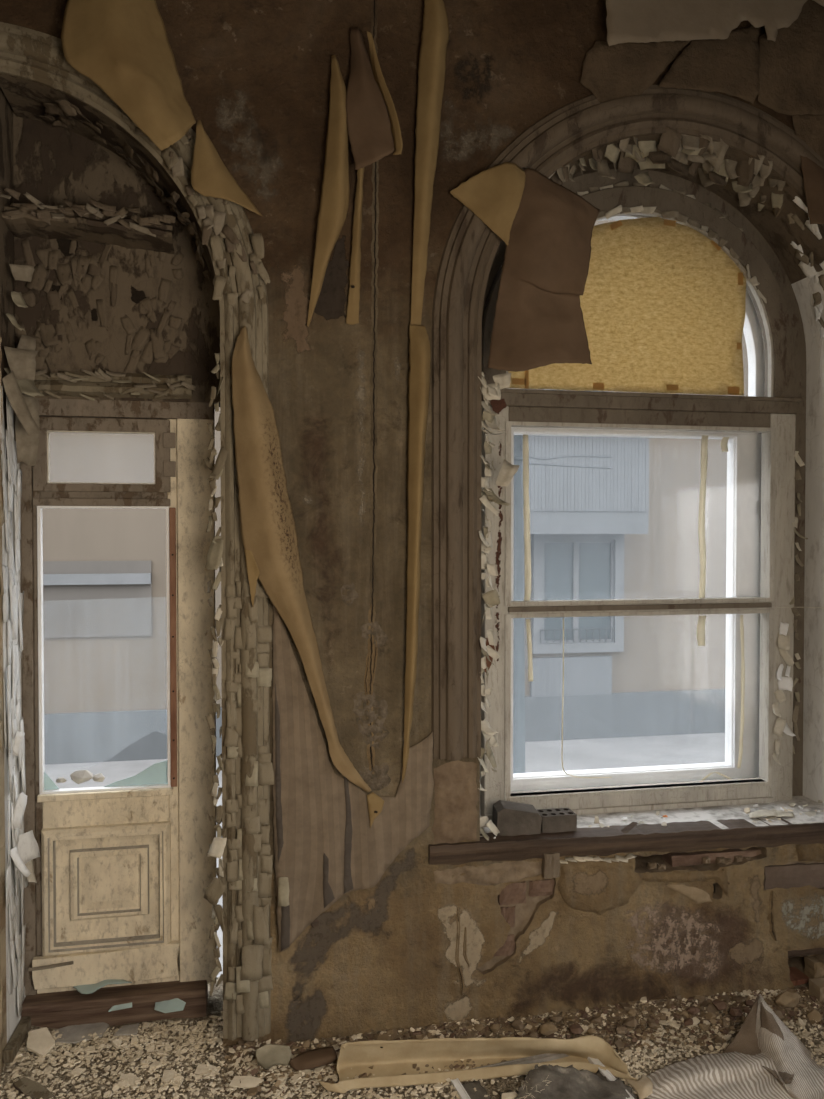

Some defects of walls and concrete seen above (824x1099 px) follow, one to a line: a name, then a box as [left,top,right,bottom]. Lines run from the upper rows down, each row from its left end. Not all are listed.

peeling [551,126,822,239]
peeling [597,205,767,303]
peeling [790,241,824,338]
peeling [432,372,520,844]
peeling [772,597,801,765]
flaking render [635,843,824,922]
flaking render [285,848,415,1042]
leakage [513,906,759,1014]
spalling [788,948,824,986]